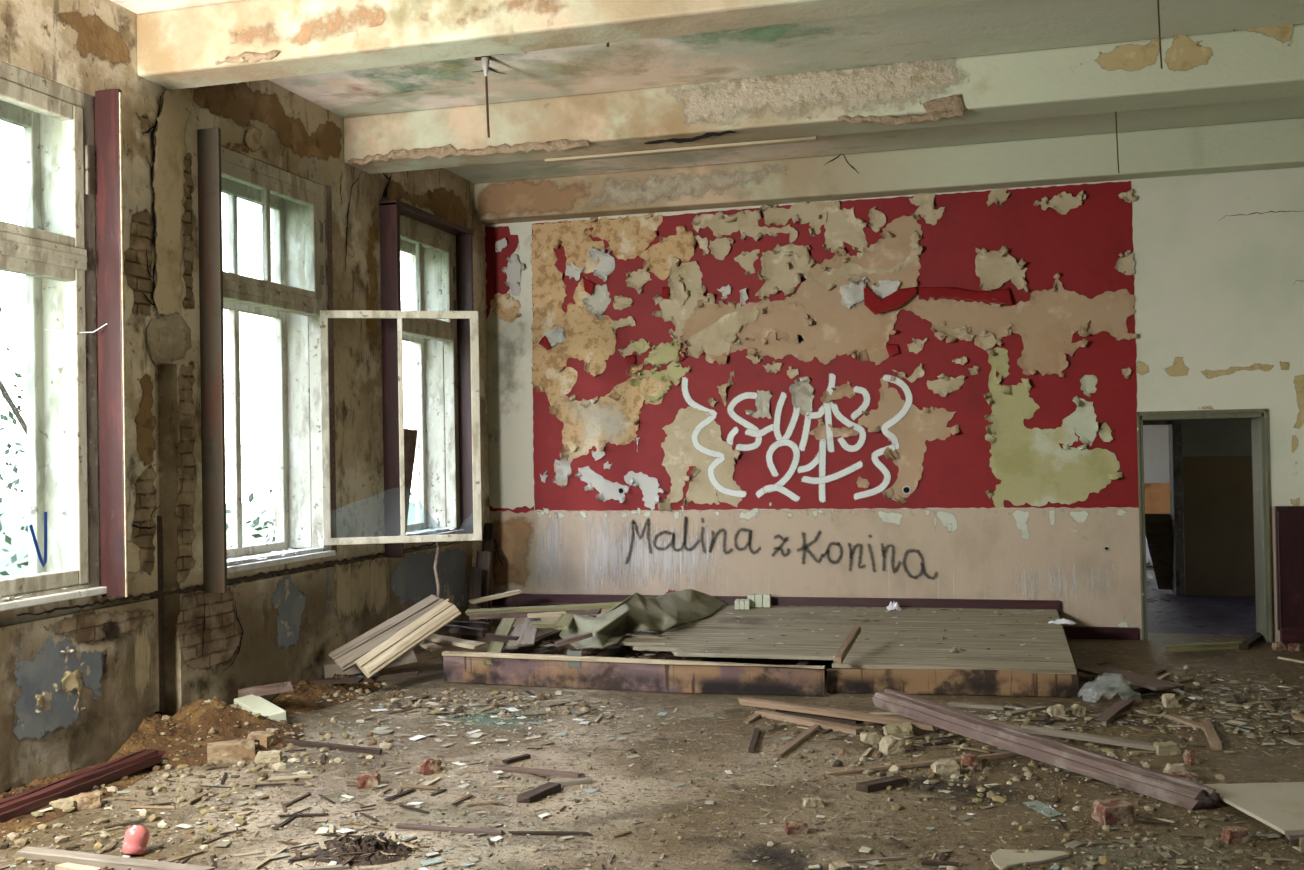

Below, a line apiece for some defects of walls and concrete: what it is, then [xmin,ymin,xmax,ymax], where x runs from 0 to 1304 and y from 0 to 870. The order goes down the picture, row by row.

flaking render [44,10,130,65]
spalling [215,50,279,65]
flaking render [193,82,589,167]
crack [644,130,736,144]
spalling [838,94,965,126]
peeling [1081,35,1213,71]
crack [143,96,161,312]
flaking render [124,209,153,316]
peeling [490,188,1137,512]
spalling [1165,357,1304,467]
flaking render [132,374,157,575]
flaking render [175,361,242,670]